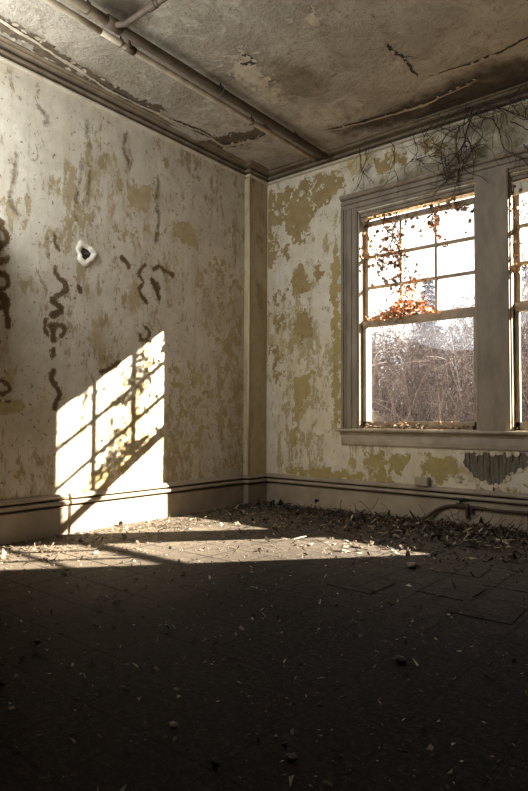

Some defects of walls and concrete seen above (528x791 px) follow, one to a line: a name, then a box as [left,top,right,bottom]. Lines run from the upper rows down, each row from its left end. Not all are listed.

flaking render [0,15,165,119]
peeling [222,45,291,114]
crack [321,37,528,132]
flaking render [191,123,270,149]
peeling [127,183,152,213]
spalling [76,240,98,267]
peeling [171,220,200,251]
peeling [267,169,354,450]
peeling [76,256,244,491]
flaking render [285,449,528,493]